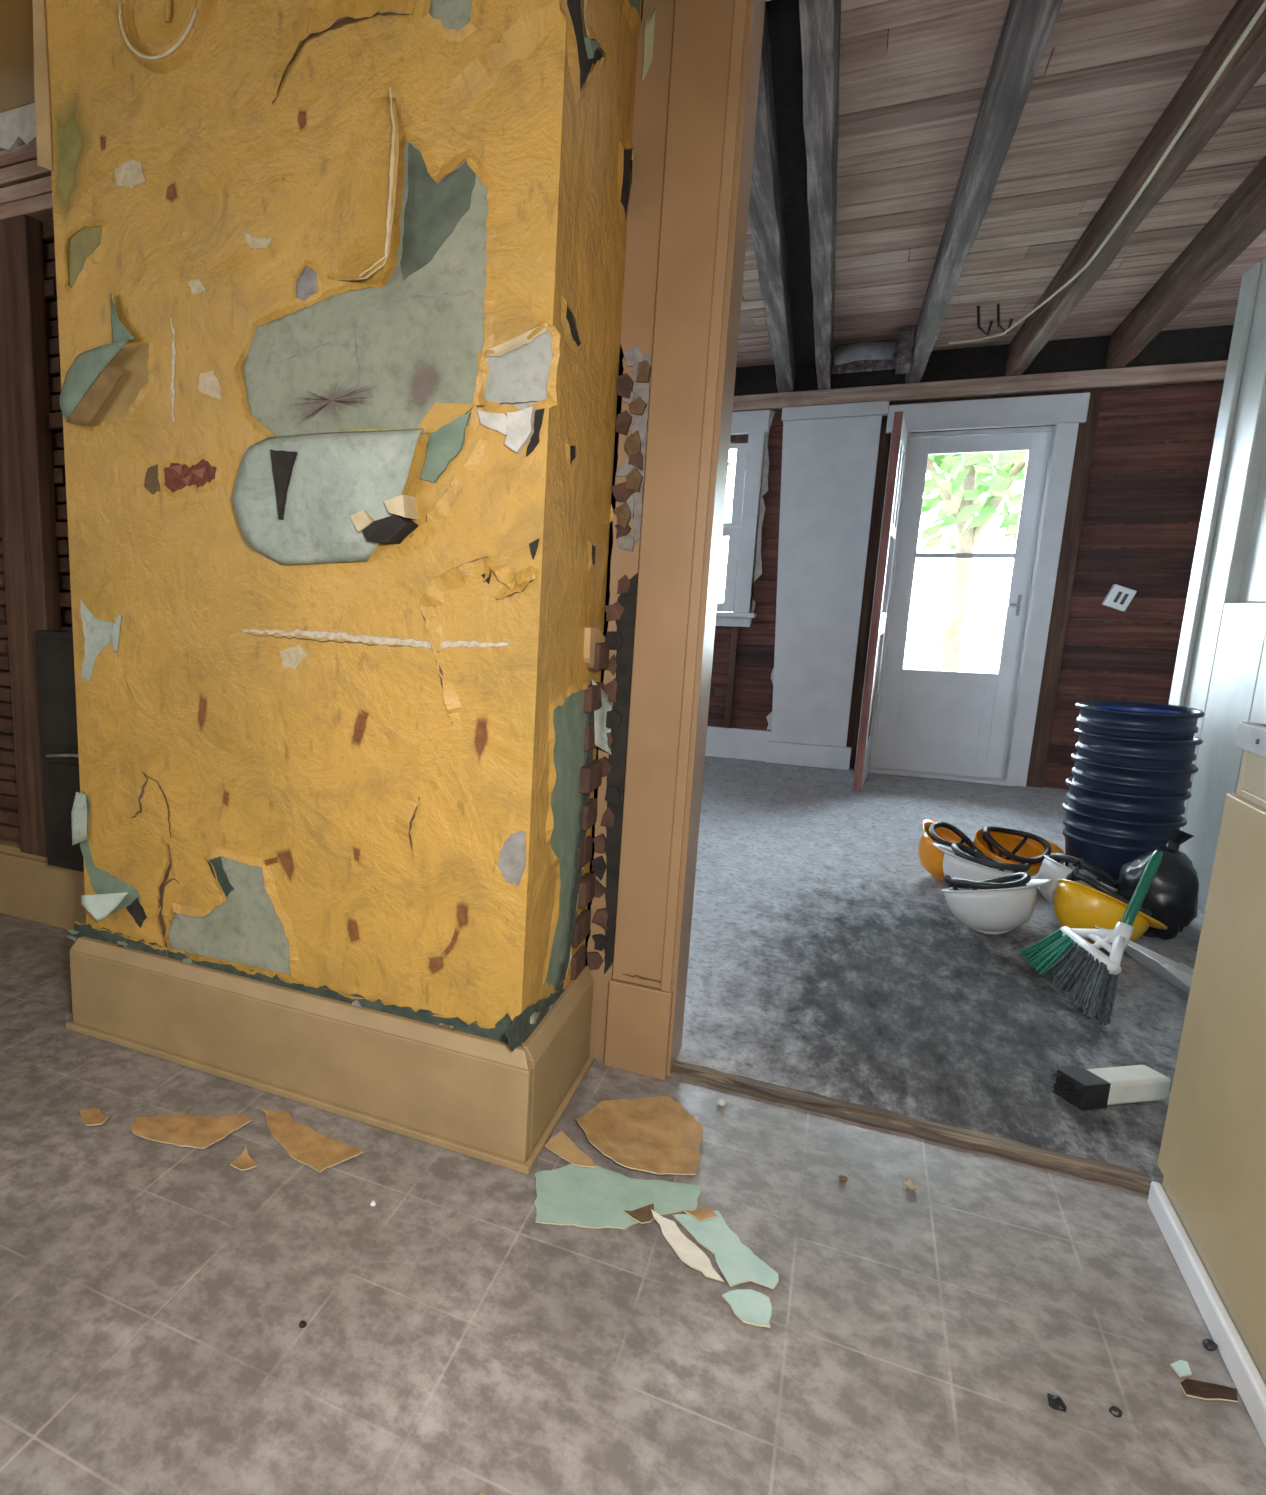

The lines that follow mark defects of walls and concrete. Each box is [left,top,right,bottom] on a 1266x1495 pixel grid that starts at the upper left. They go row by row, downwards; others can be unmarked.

peeling [421,0,481,42]
spalling [567,0,603,91]
peeling [615,0,656,81]
peeling [60,294,155,434]
peeling [143,87,580,568]
flaking render [67,343,652,1054]